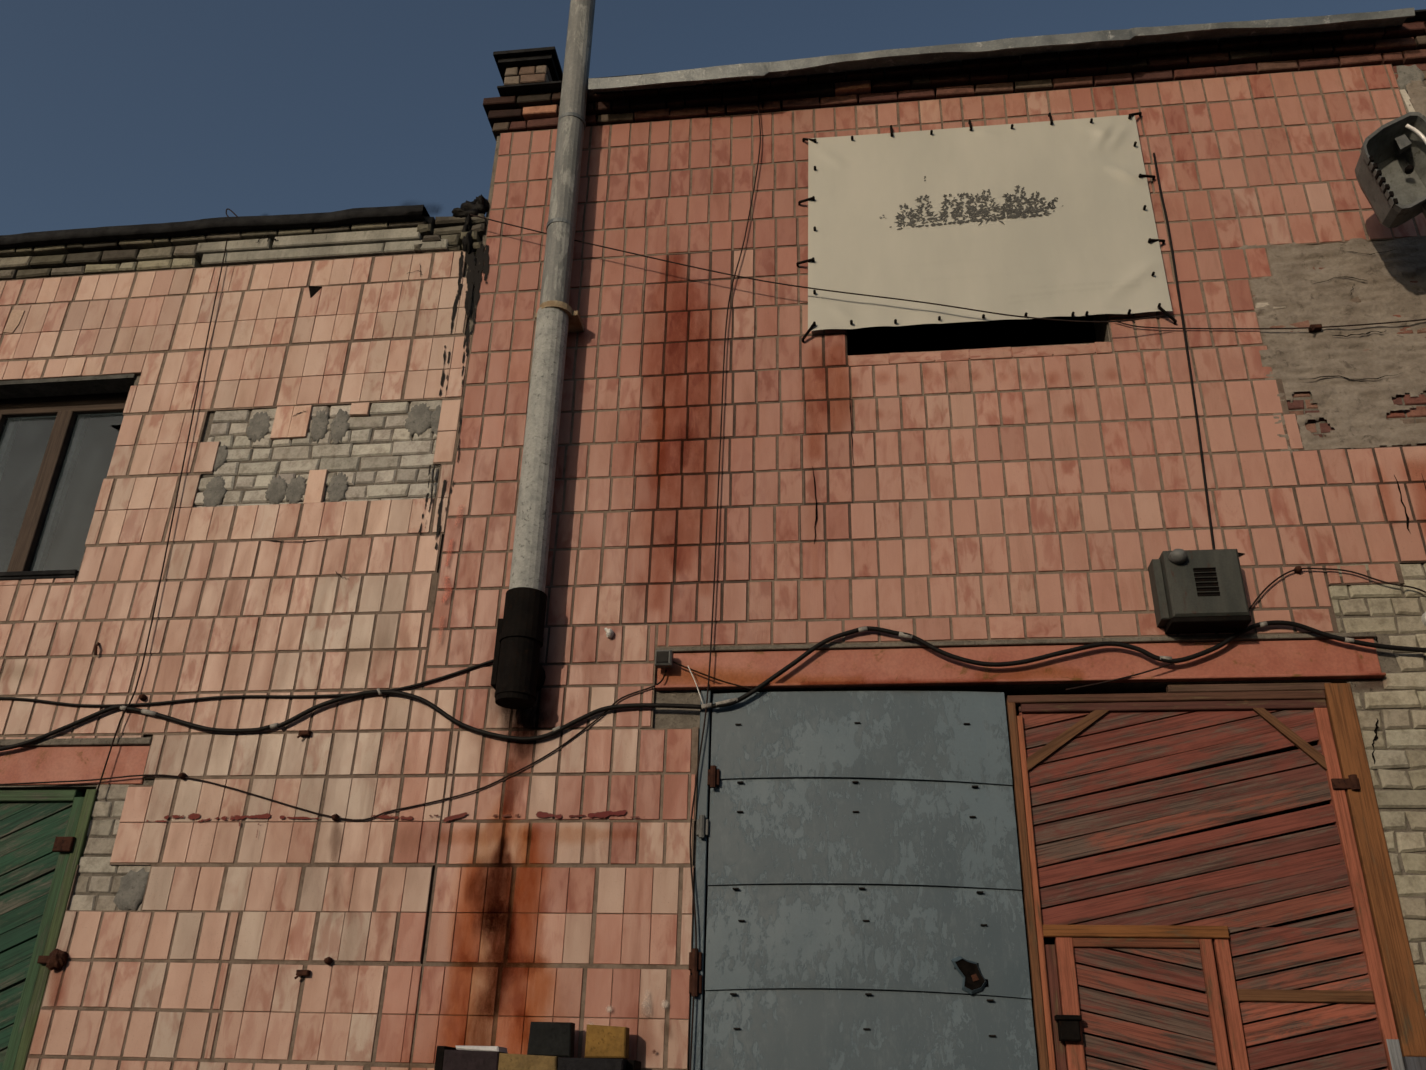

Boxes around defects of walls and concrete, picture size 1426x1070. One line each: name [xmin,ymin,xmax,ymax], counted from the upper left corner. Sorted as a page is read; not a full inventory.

peeling [1392,63,1426,117]
water stain [439,244,489,462]
peeling [1236,235,1426,454]
spalling [194,400,442,507]
water stain [418,465,454,549]
spalling [69,784,151,911]
corrosion [481,839,511,1009]
spalling [1328,563,1426,1016]